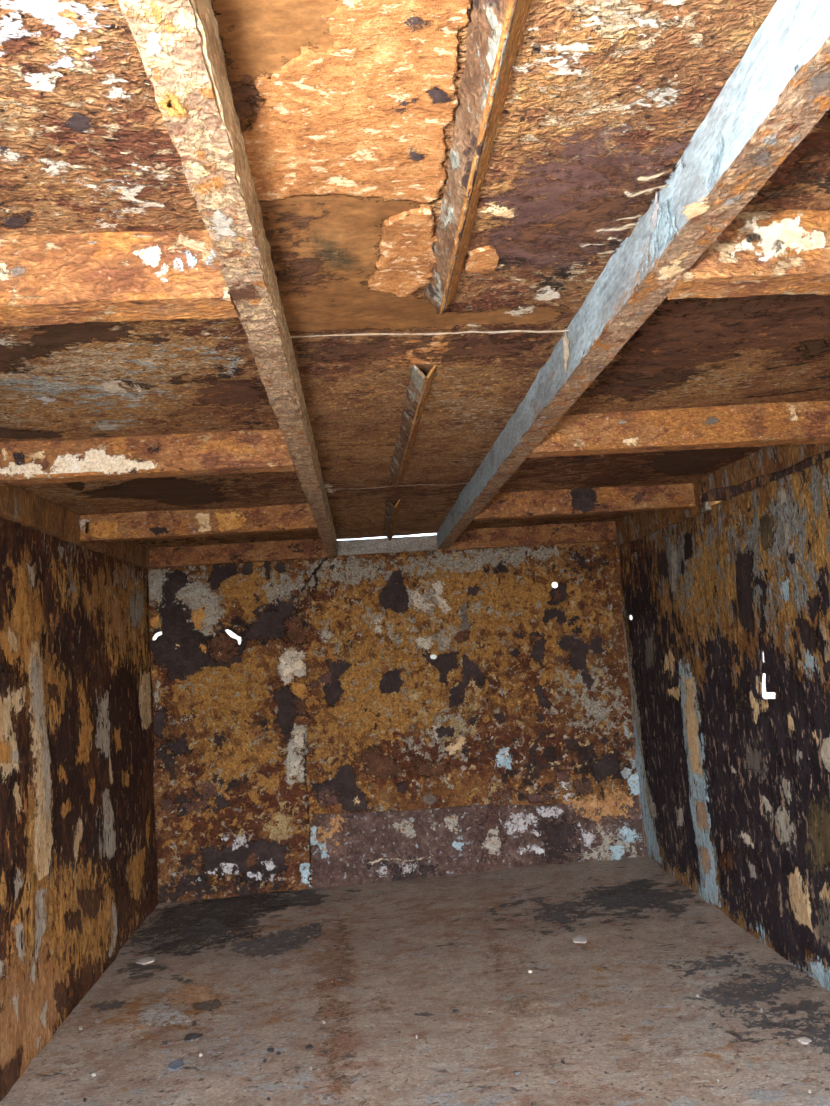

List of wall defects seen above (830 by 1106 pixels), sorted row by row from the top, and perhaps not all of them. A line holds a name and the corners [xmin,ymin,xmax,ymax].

peeling [0,16,42,57]
peeling [211,0,340,132]
corrosion [465,124,691,274]
peeling [731,232,784,258]
peeling [0,322,170,374]
peeling [0,427,78,466]
corrosion [195,511,247,533]
corrosion [735,514,776,633]
corrosion [0,557,153,1102]
damp [142,834,312,959]
damp [667,942,800,980]
damp [91,1001,124,1010]